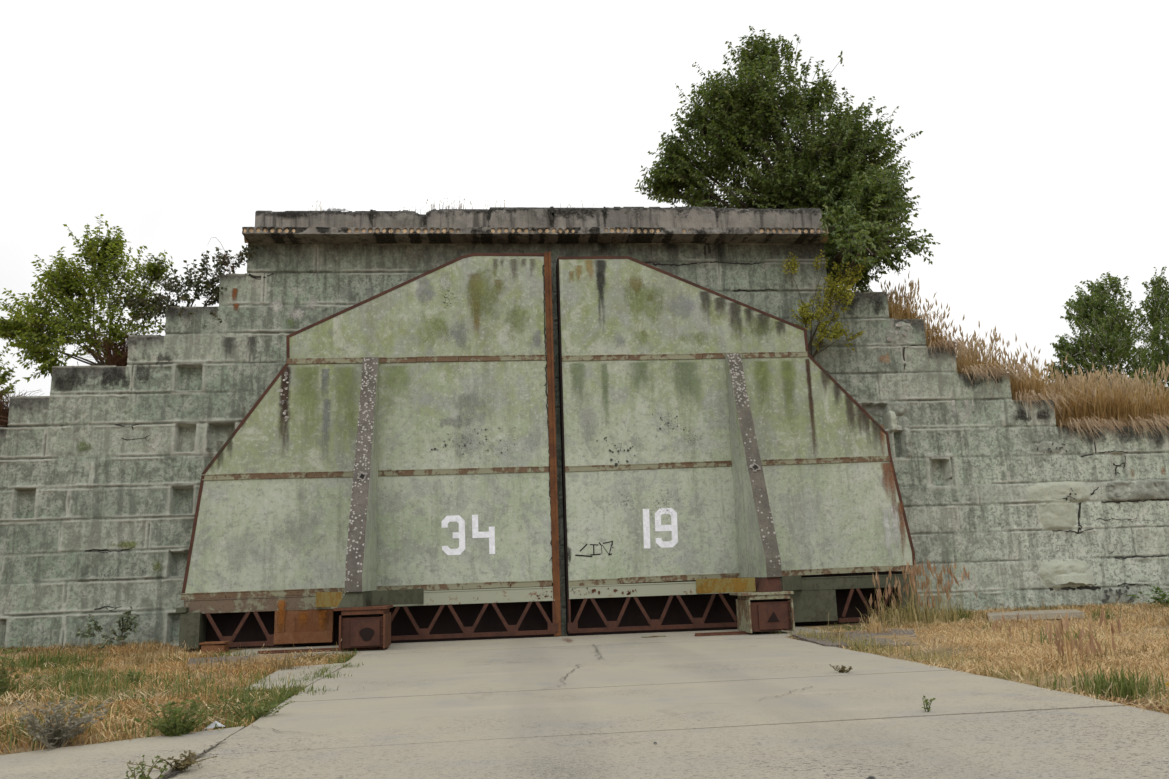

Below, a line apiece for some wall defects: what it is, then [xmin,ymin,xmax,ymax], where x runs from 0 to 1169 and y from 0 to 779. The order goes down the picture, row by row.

leakage [597,243,625,317]
leakage [701,291,784,332]
leakage [279,367,290,439]
rust [883,463,905,542]
crack [164,739,226,776]